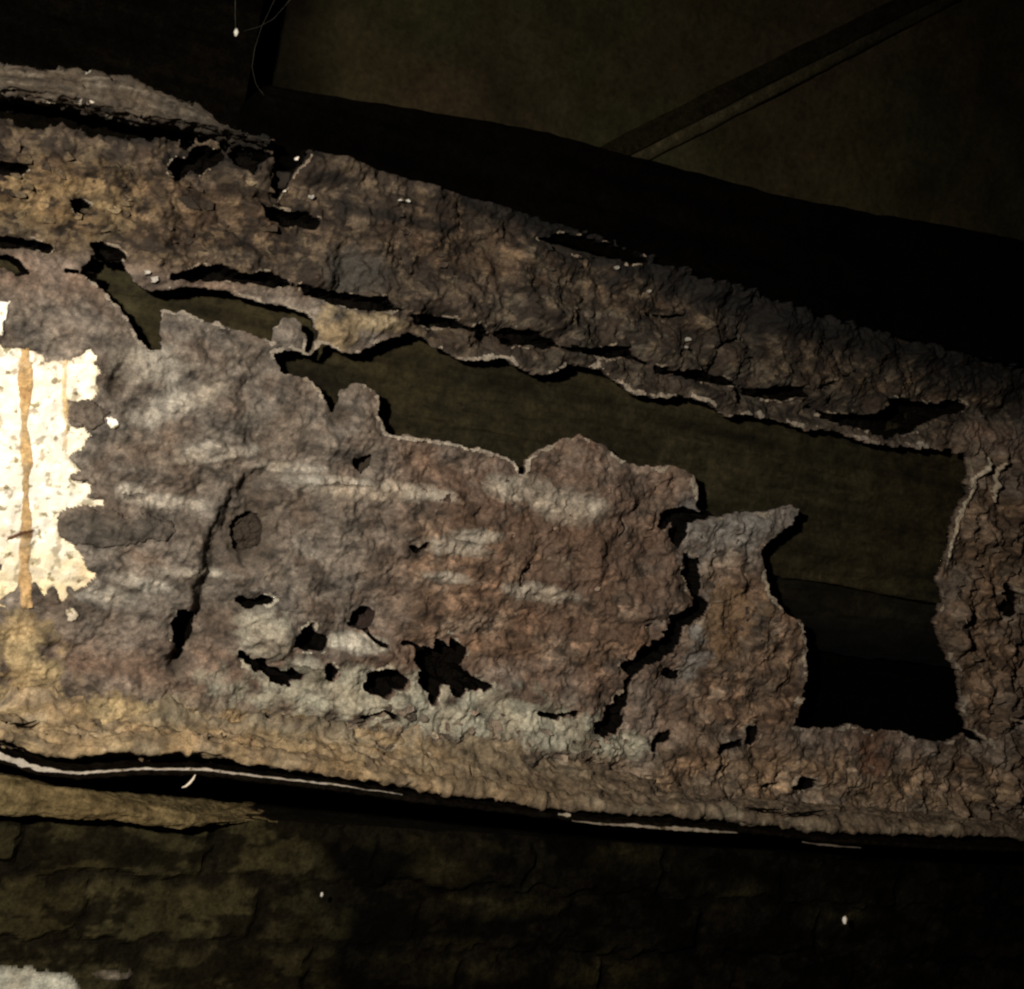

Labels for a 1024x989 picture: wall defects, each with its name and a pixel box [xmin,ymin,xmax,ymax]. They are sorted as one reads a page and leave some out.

rust [0,348,66,700]
peeling [0,301,104,621]
peeling [106,416,119,429]
rust [89,693,155,725]
spalling [345,704,630,765]
spalling [396,486,652,684]
crack [170,263,969,440]
spalling [393,190,760,348]
crack [537,551,708,741]
crack [745,807,826,816]
spalling [651,529,1024,816]